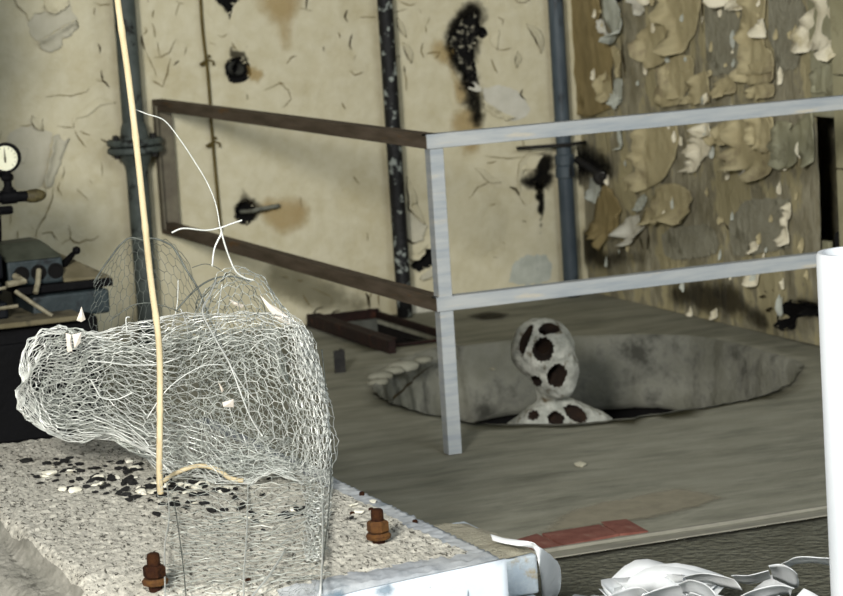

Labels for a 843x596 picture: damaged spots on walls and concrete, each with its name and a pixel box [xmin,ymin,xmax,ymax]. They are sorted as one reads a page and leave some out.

flaking render [16,0,79,52]
peeling [571,0,836,117]
crack [24,71,116,147]
flaking render [7,126,70,190]
crack [10,166,103,245]
peeling [584,113,814,257]
peeling [741,274,759,287]
spalling [773,300,819,331]
peeling [58,474,105,493]
peeling [126,460,210,504]